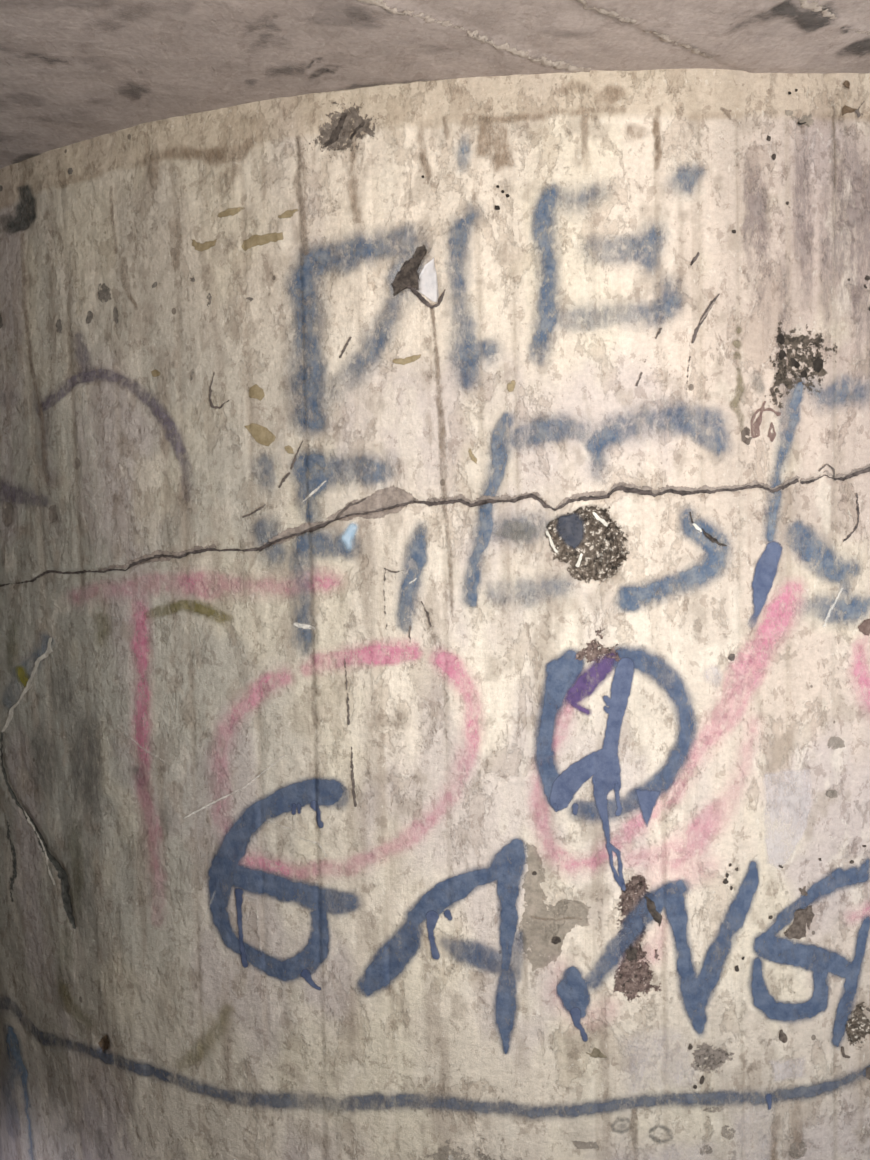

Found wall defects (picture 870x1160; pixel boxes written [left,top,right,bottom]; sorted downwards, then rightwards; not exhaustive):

spalling [305,102,379,162]
spalling [5,185,36,233]
spalling [391,245,445,309]
crack [23,268,47,462]
spalling [742,322,838,445]
crack [0,294,870,642]
spalling [504,505,629,585]
crack [0,637,76,929]
spalling [613,873,662,1001]
spalling [688,1043,734,1089]
spalling [841,1002,870,1058]
leakage [573,1141,598,1149]